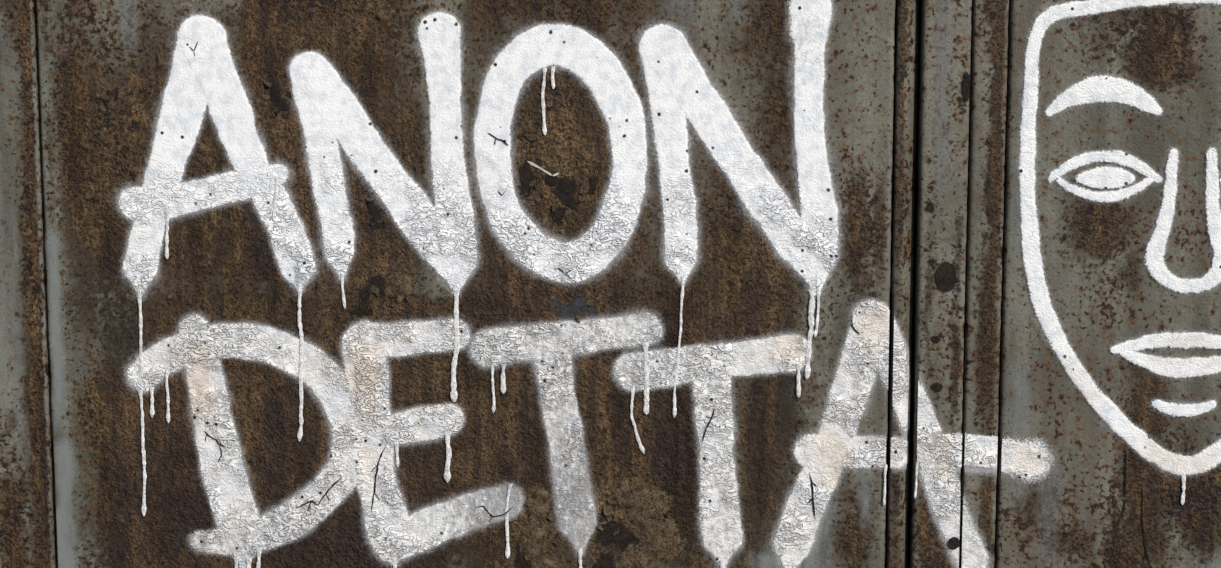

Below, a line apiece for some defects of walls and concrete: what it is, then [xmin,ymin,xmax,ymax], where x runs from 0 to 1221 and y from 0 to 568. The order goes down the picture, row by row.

rust [1069,0,1204,93]
rust [0,0,911,568]
rust [921,232,937,384]
rust [949,0,1007,437]
rust [1058,185,1146,298]
rust [1122,360,1214,456]
water stain [759,554,782,568]
water stain [804,514,828,568]
rust [916,479,955,568]
rust [979,467,995,568]
rust [1013,437,1221,568]